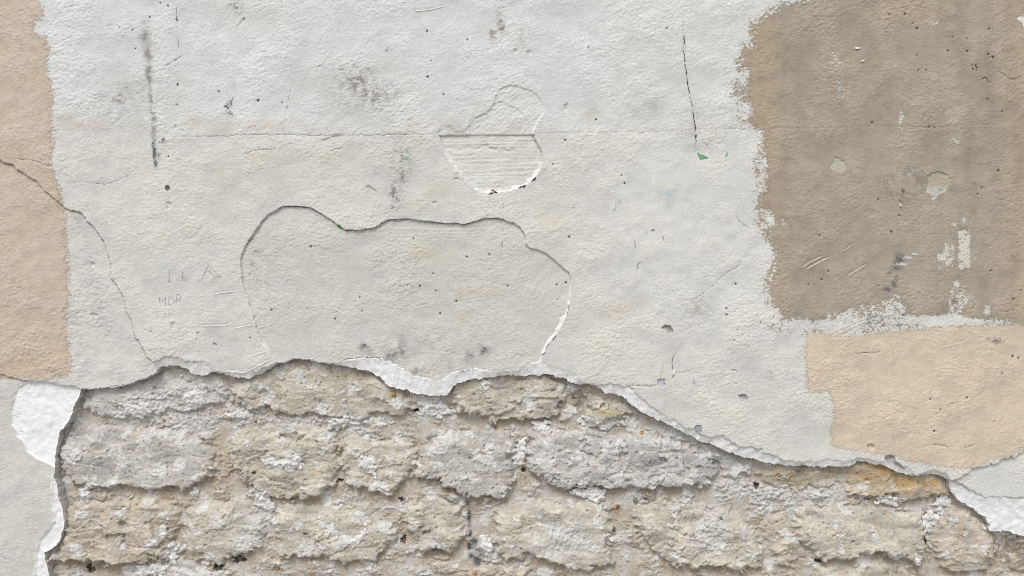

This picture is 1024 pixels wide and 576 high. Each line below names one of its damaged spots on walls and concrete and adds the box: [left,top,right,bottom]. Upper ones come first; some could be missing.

flaking render [436,85,553,194]
flaking render [5,163,1024,576]